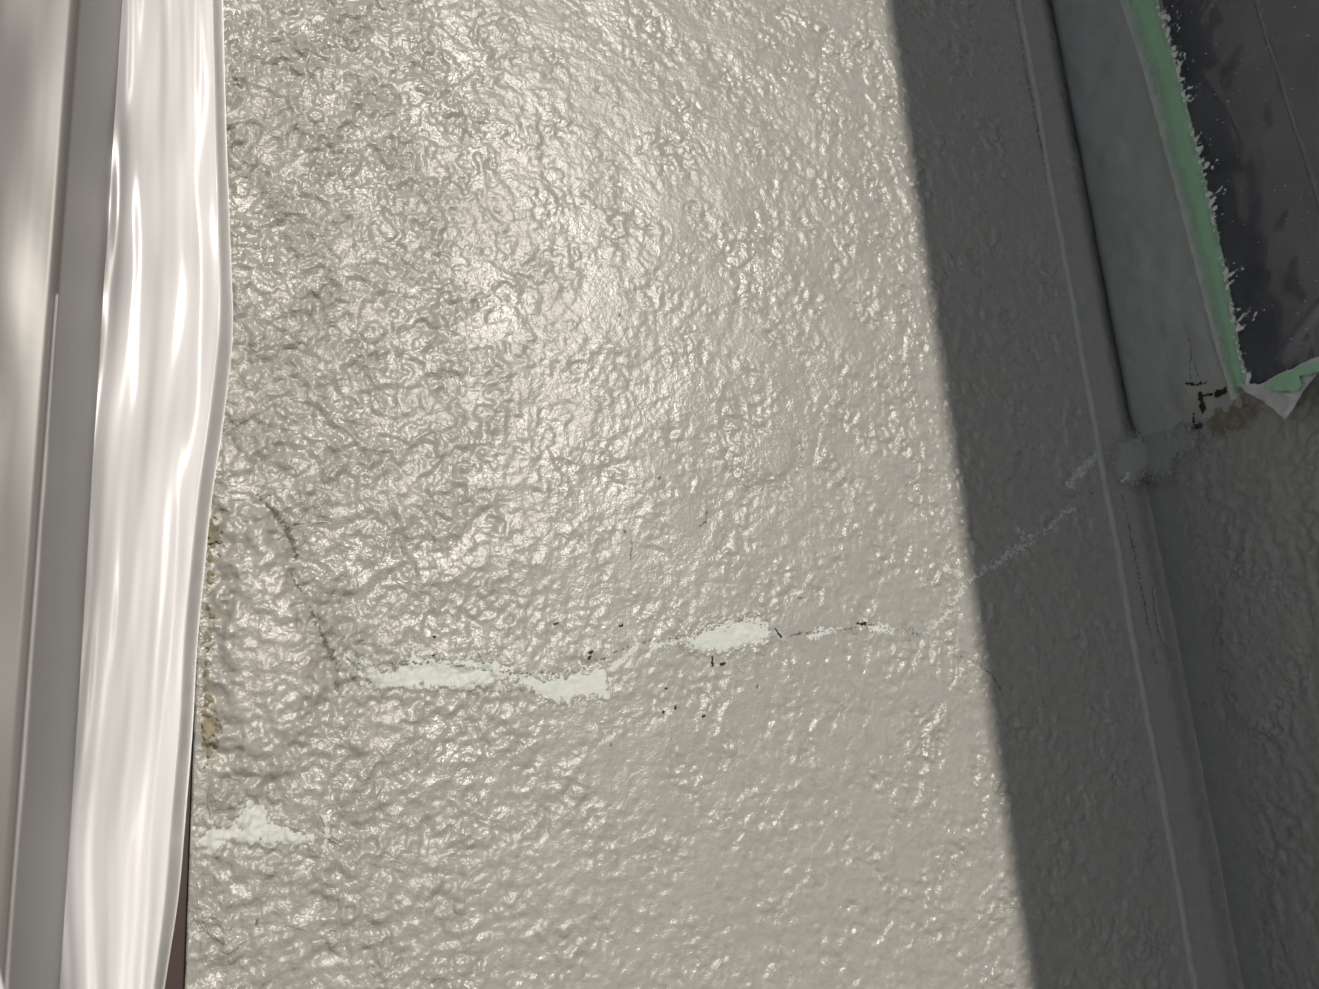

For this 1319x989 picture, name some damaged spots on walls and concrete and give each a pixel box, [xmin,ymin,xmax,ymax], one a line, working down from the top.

crack [256,449,1099,691]
peeling [337,608,790,713]
peeling [806,626,847,641]
peeling [868,622,896,635]
peeling [190,788,332,869]